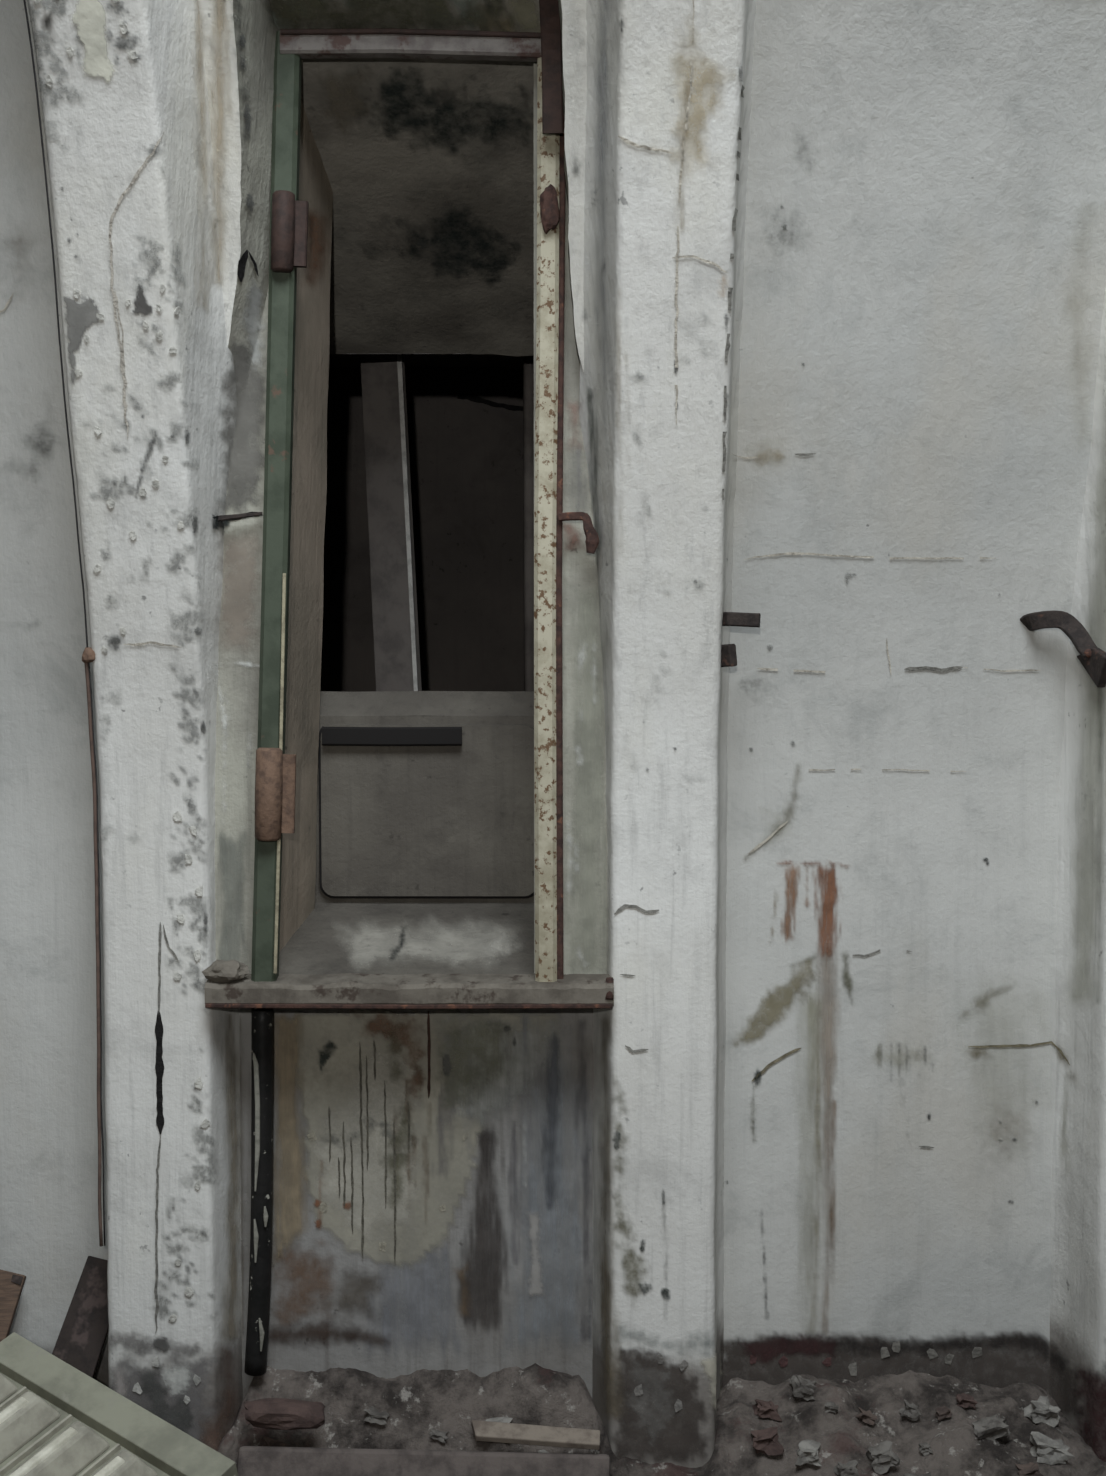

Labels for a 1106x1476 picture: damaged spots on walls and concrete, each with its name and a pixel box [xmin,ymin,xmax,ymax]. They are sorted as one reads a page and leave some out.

mould [270,0,504,31]
damp [680,57,716,152]
damp [411,213,509,282]
corrosion [783,861,837,1167]